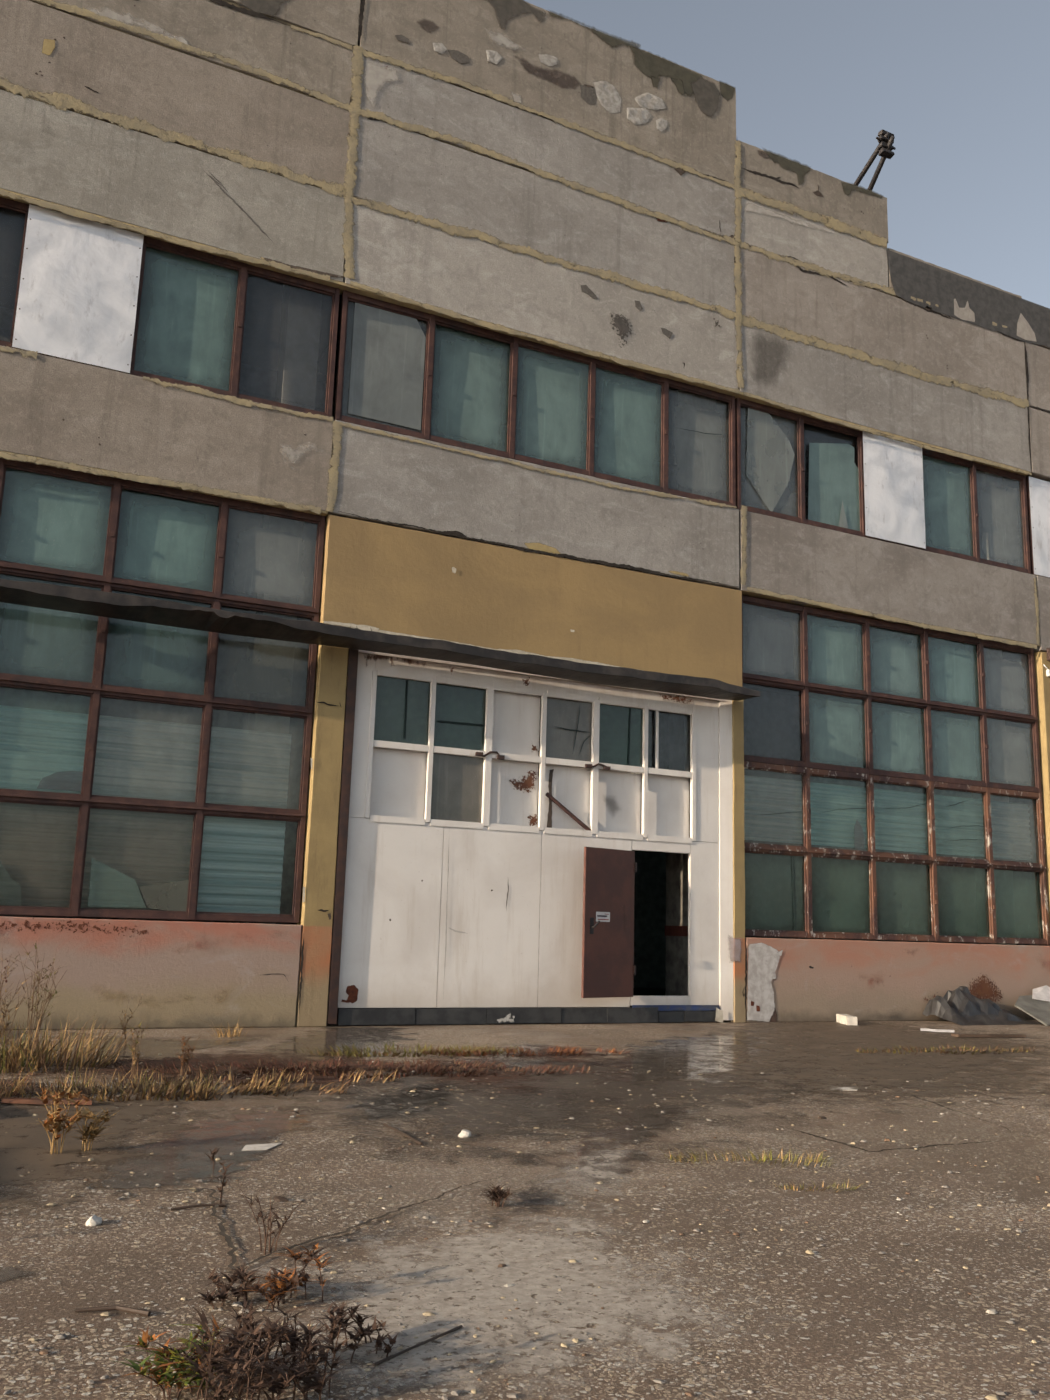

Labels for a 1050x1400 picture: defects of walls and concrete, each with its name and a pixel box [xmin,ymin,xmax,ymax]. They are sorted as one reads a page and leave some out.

spalling [432,42,469,63]
peeling [486,50,503,64]
peeling [538,54,558,66]
peeling [580,81,667,132]
spalling [581,285,597,311]
peeling [954,299,975,322]
spalling [610,301,672,348]
peeling [1017,313,1037,342]